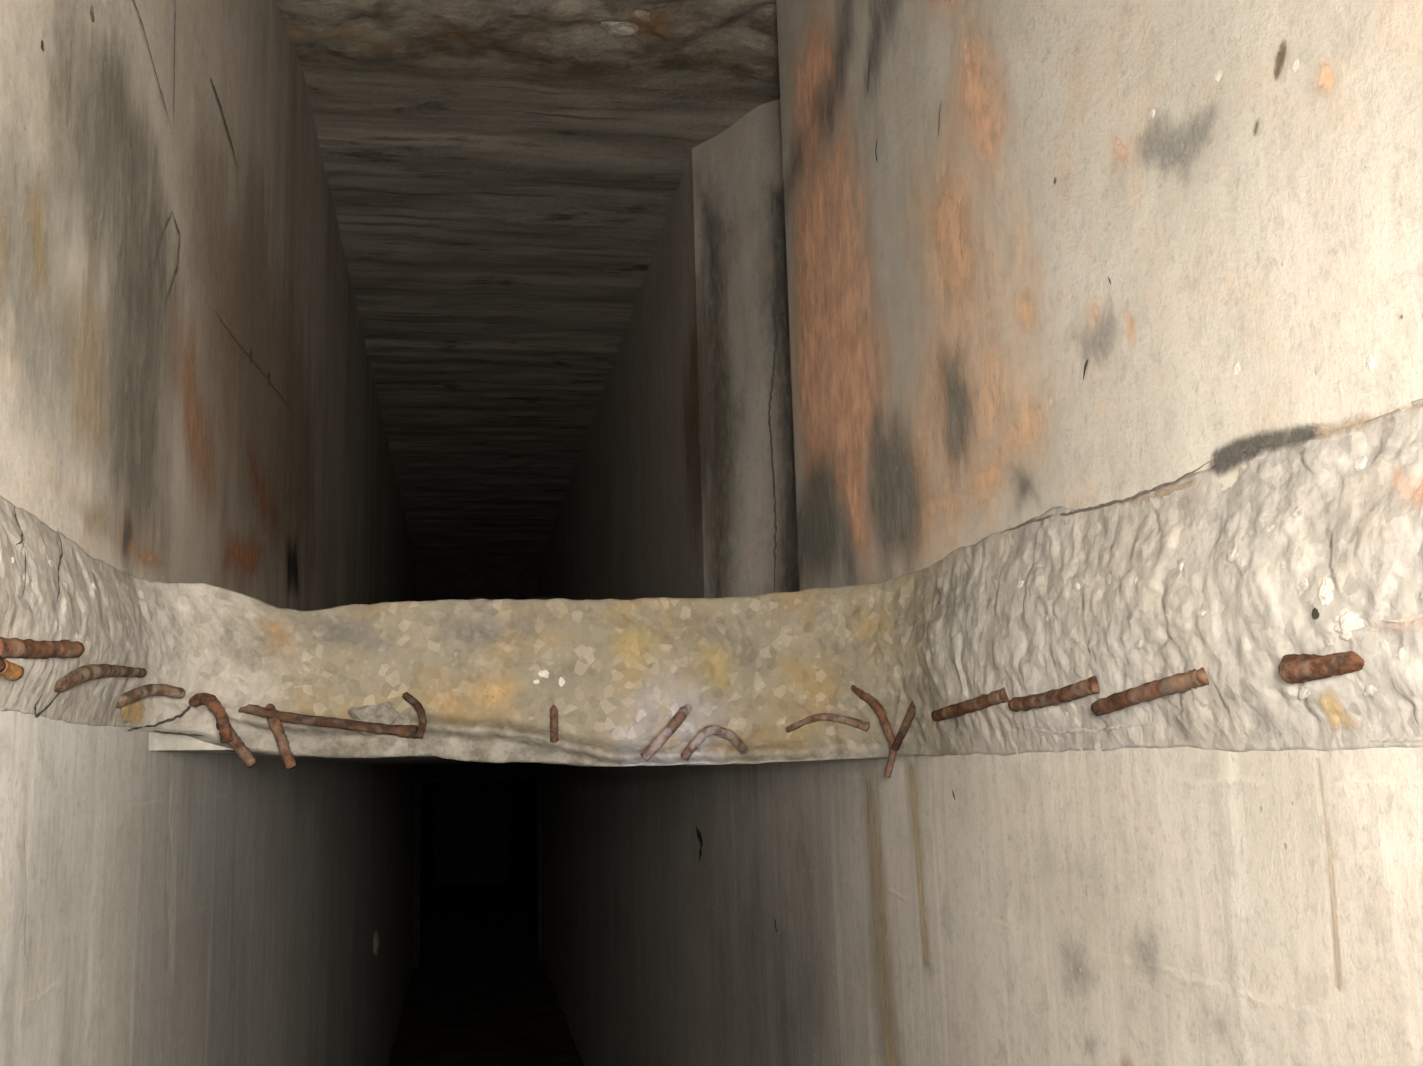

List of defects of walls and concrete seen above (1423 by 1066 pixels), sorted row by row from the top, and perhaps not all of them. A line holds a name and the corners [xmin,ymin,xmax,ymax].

leakage [1,161,62,400]
leakage [54,20,167,553]
corrosion [796,28,877,545]
leakage [871,420,920,557]
leakage [947,363,968,457]
leakage [1211,426,1319,473]
leakage [288,548,298,589]
spalling [0,398,1423,778]
corrosion [1320,695,1352,725]